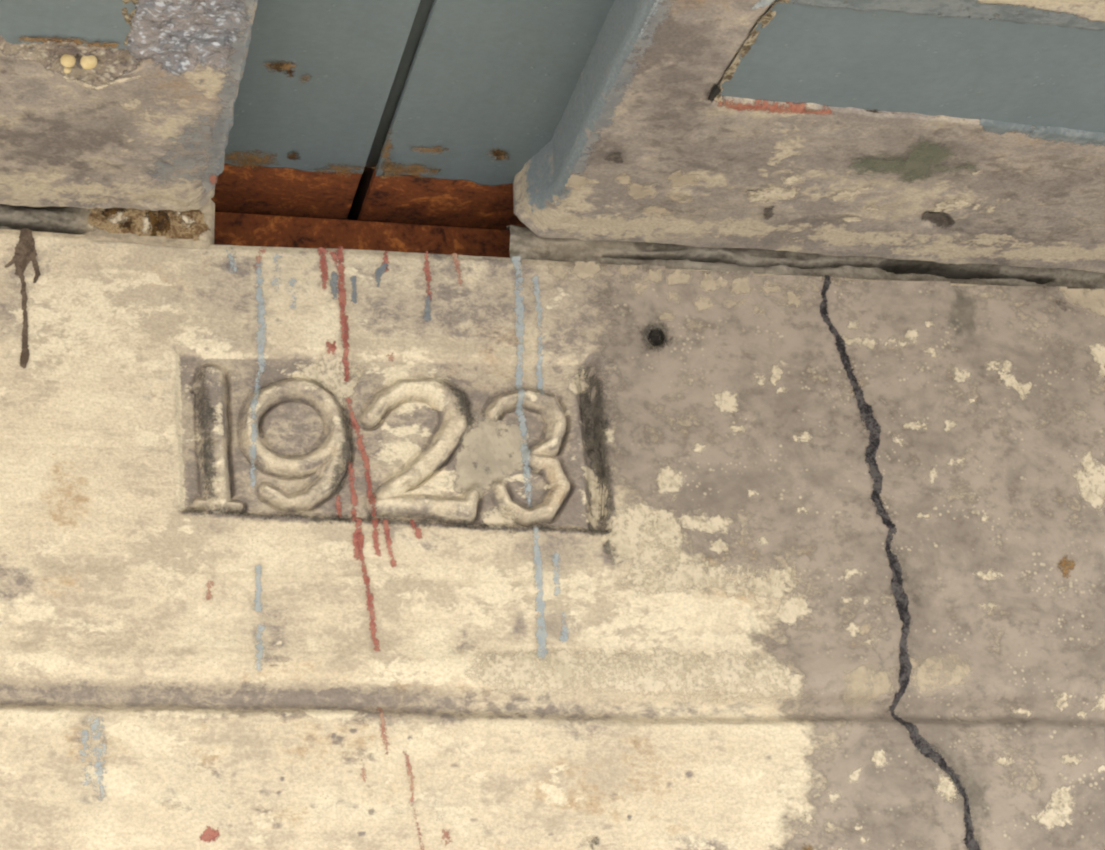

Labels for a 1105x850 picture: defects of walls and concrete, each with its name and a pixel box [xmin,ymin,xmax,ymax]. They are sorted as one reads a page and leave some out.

spalling [0,0,250,90]
corrosion [317,133,445,220]
damp [849,141,976,183]
spalling [88,208,210,241]
damp [5,228,41,369]
damp [586,265,1105,850]
crack [820,275,981,850]